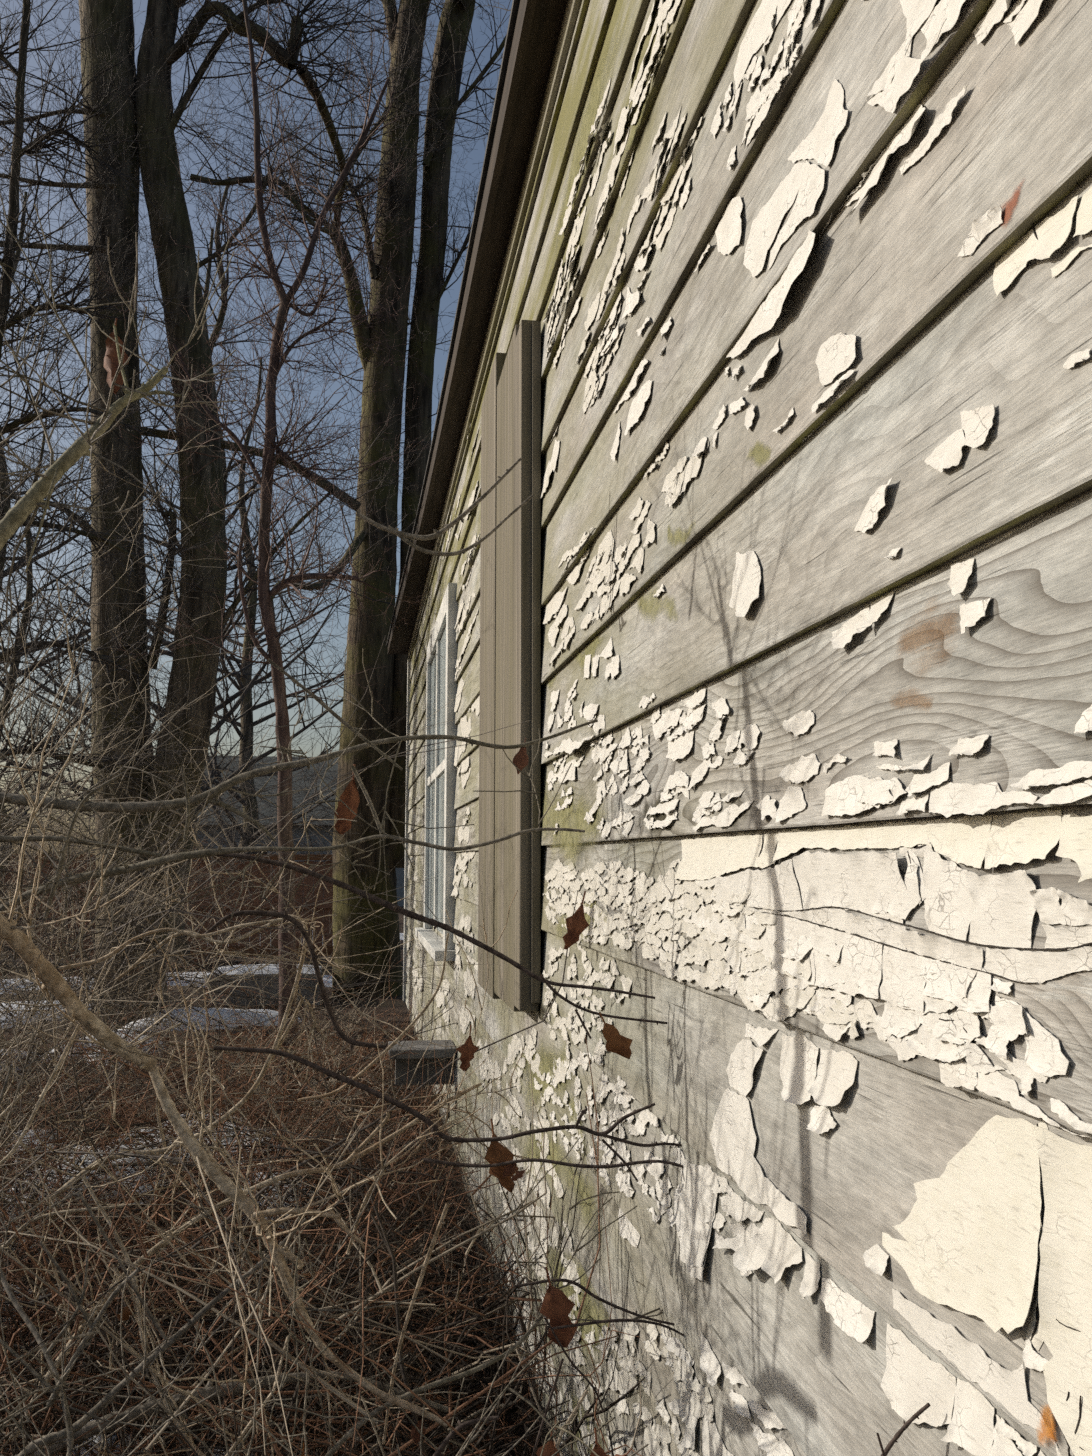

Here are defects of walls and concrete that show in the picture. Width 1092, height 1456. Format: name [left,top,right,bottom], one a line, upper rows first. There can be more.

peeling [972,0,1043,46]
peeling [957,205,1003,257]
peeling [993,186,1092,297]
peeling [541,0,969,667]
peeling [1063,349,1091,369]
crack [747,832,805,870]
peeling [407,404,1092,1456]
crack [731,838,1092,983]
crack [1027,1121,1079,1351]
crack [1062,1392,1085,1456]